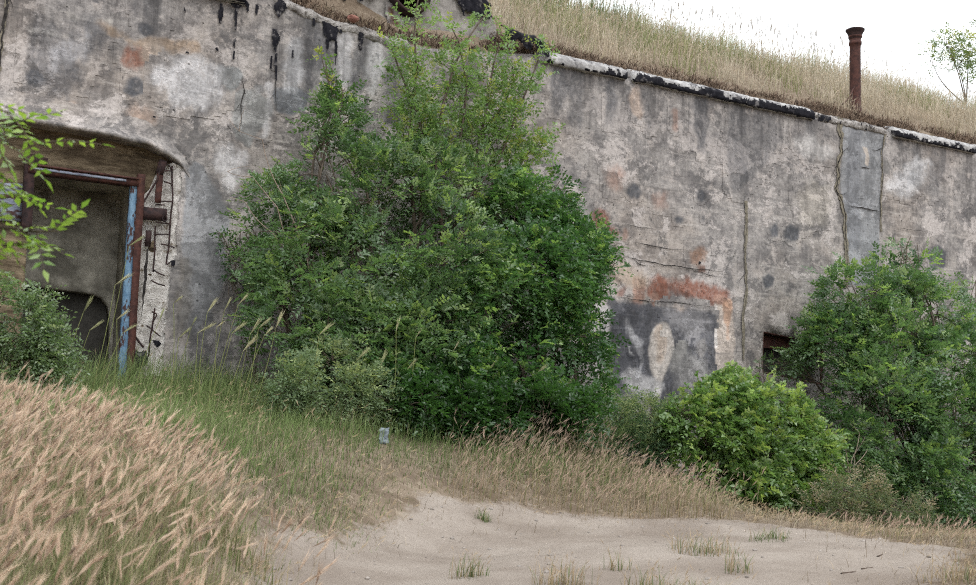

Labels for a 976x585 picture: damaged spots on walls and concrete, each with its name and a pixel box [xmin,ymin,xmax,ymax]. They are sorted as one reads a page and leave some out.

crack [0,0,13,72]
leakage [13,0,117,104]
leakage [119,0,259,119]
leakage [203,0,419,201]
leakage [605,294,660,400]
crack [606,291,702,306]
corrosion [588,201,736,306]
crack [624,201,748,359]
crack [834,116,930,288]